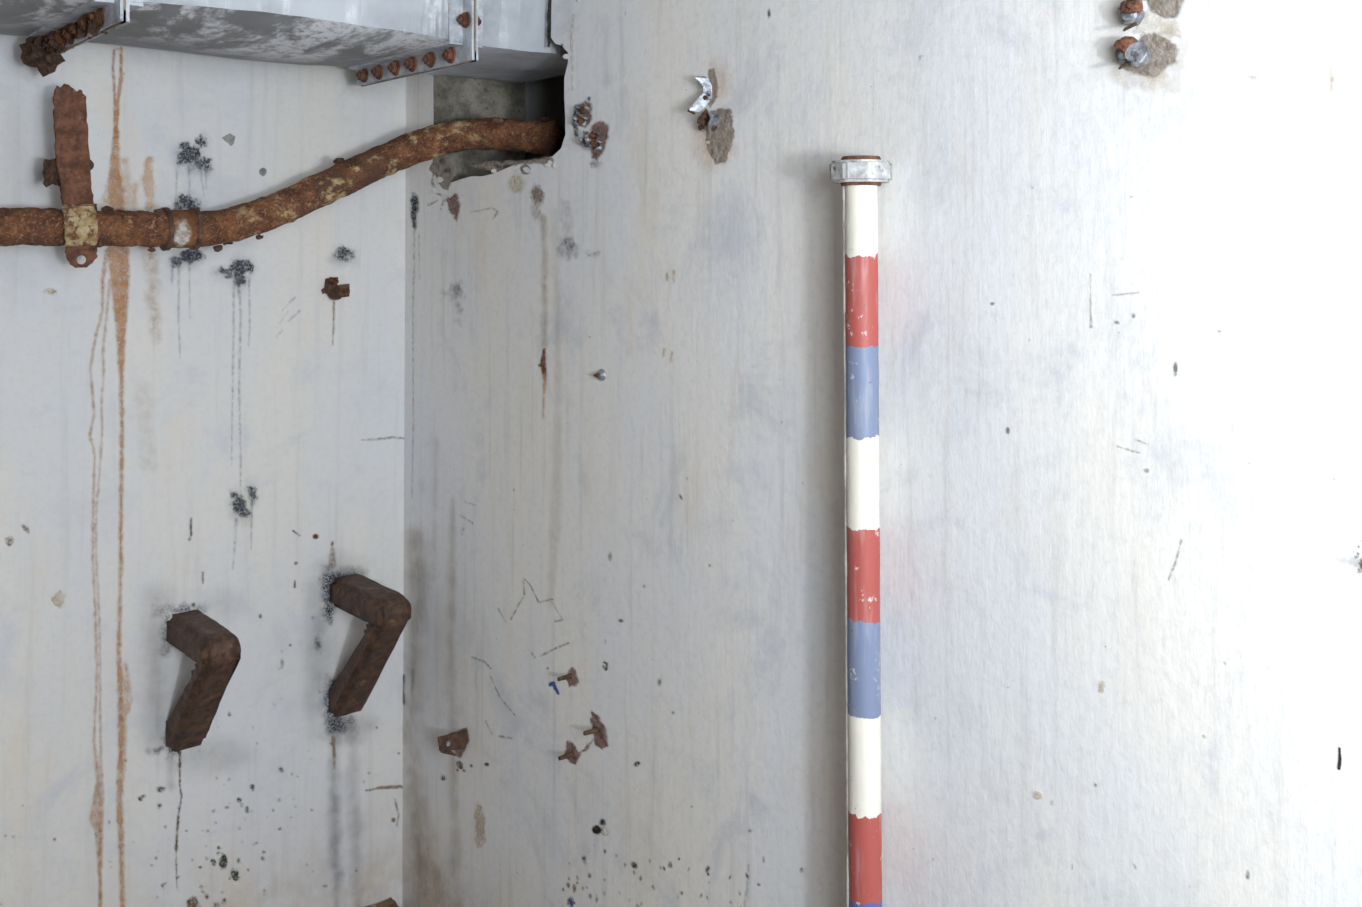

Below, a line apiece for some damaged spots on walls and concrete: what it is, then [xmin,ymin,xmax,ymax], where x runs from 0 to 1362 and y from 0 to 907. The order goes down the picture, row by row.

spalling [1124,0,1184,77]
rust [101,48,124,213]
rust [143,158,164,212]
spalling [429,156,559,220]
rust [102,246,129,907]